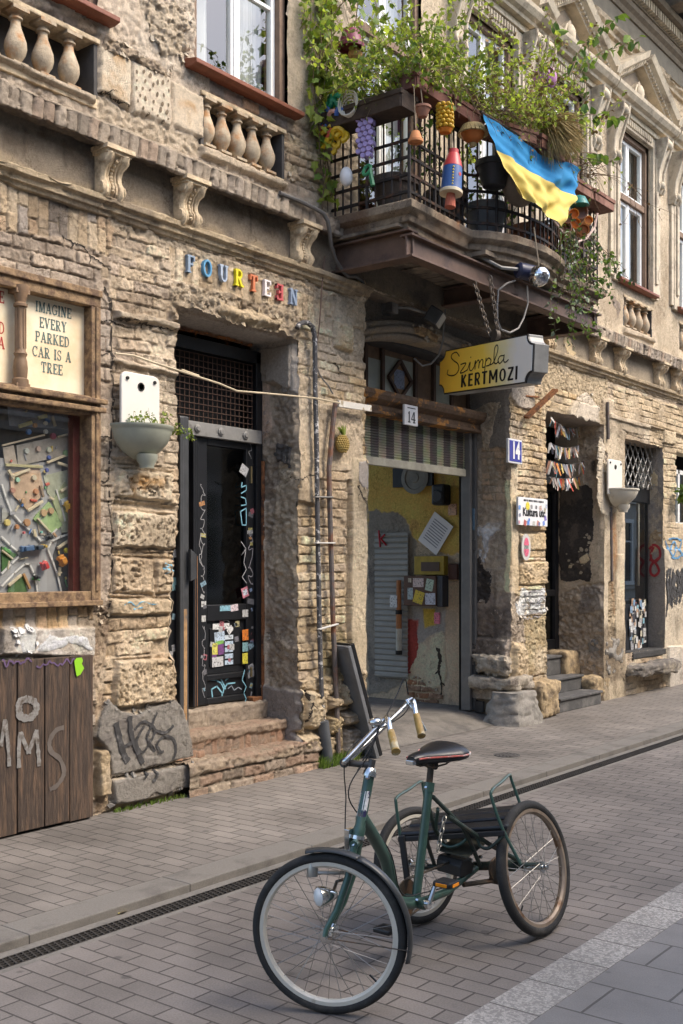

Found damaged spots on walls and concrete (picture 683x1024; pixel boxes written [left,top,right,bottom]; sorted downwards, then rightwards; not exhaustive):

peeling [558,437,611,582]